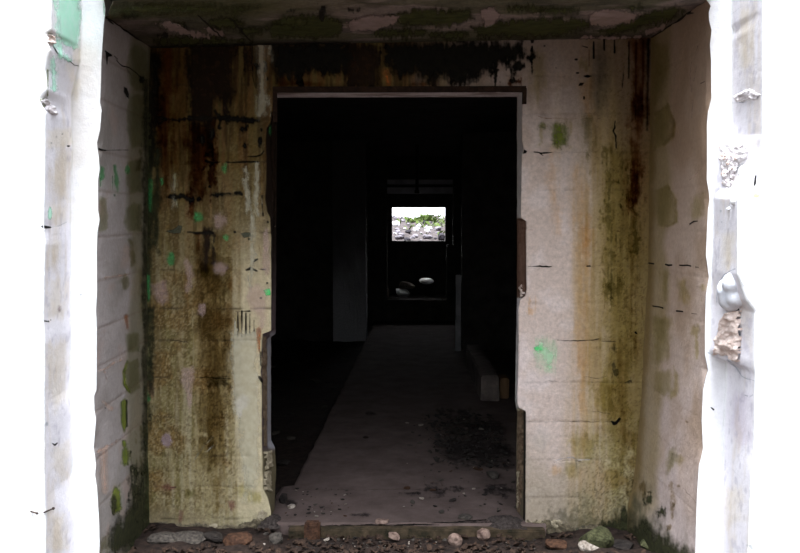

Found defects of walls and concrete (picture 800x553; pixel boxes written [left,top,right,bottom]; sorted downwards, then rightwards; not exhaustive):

damp [185,40,536,156]
spalling [718,142,748,186]
damp [197,227,216,273]
damp [147,308,155,393]
damp [237,310,255,345]
spalling [712,310,742,362]